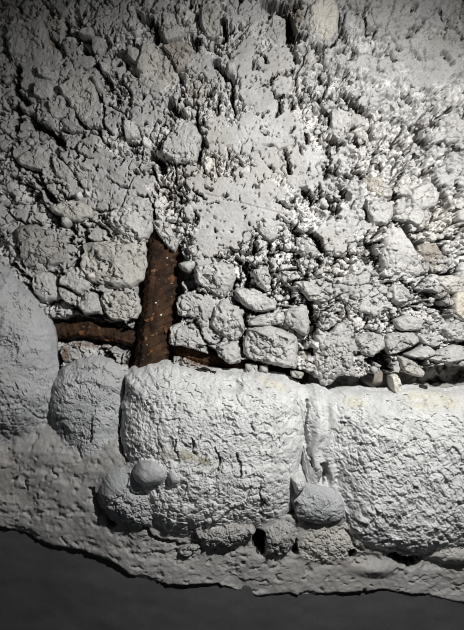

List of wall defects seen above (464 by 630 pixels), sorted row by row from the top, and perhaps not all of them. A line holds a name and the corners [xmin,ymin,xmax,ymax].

spalling [53,229,309,384]